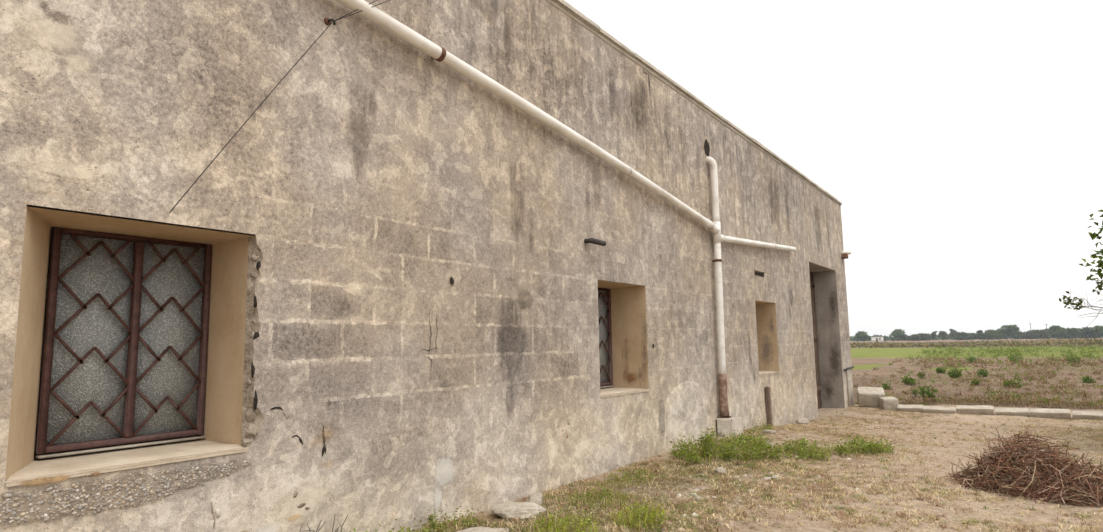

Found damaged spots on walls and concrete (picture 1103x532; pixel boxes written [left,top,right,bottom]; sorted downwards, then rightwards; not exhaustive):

peeling [0,235,265,528]